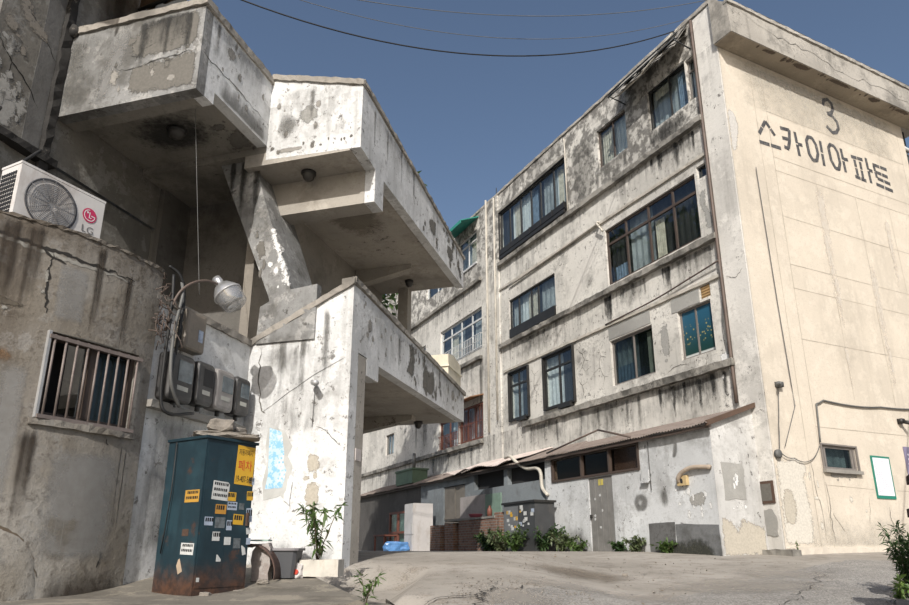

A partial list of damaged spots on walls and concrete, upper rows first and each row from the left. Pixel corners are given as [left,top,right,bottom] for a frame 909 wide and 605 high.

crack [1,39,37,106]
peeling [0,0,48,126]
leakage [140,118,207,148]
crack [0,230,135,313]
leakage [95,251,106,289]
peeling [256,228,291,288]
leakage [0,369,34,482]
crack [258,352,345,413]
peeling [407,345,462,414]
leakage [594,396,640,420]
leakage [658,372,727,408]
peeling [300,454,320,518]